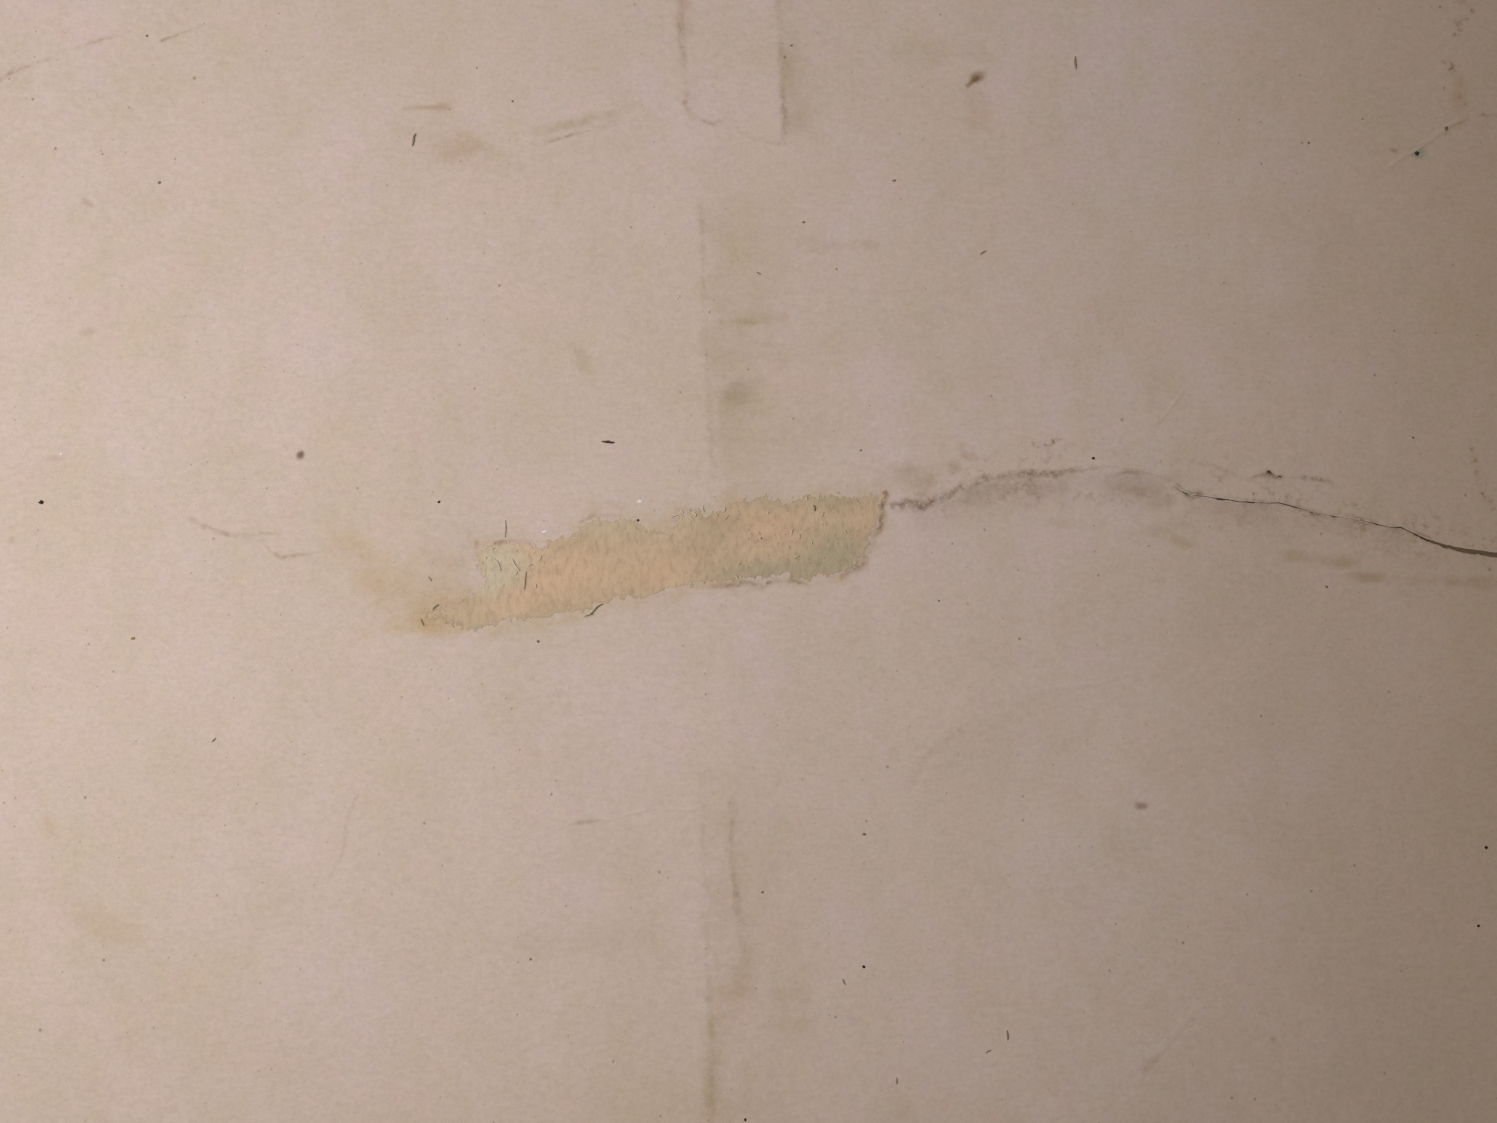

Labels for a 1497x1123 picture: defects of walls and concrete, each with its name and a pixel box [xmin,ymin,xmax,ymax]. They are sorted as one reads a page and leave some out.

peeling [421,491,887,632]
crack [1182,471,1335,517]